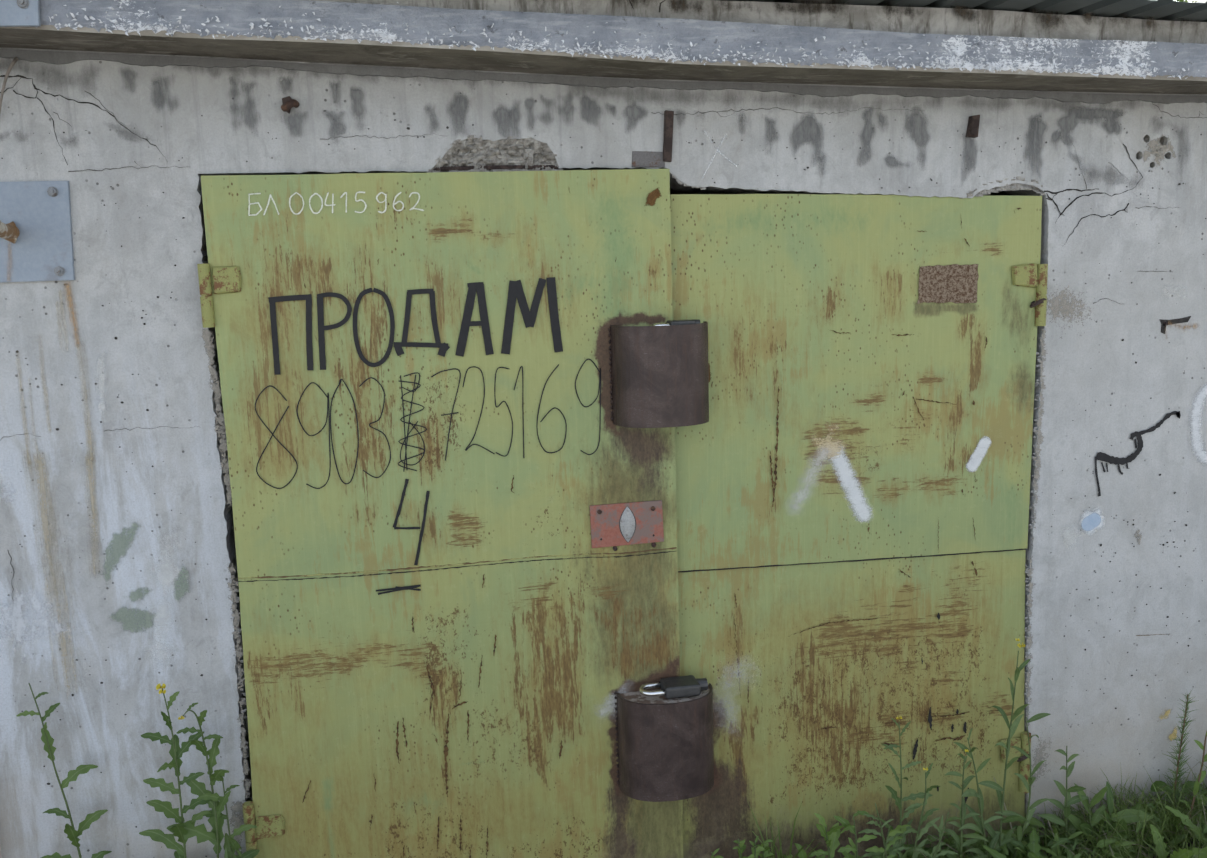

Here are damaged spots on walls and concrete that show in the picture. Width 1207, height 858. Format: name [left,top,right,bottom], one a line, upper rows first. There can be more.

crack [0,75,182,172]
water stain [327,74,363,136]
water stain [450,95,468,129]
spalling [427,124,563,173]
water stain [494,85,646,134]
water stain [792,115,823,170]
water stain [860,109,884,159]
water stain [906,109,928,157]
water stain [965,137,976,171]
water stain [1025,101,1123,168]
crack [1044,143,1179,244]
rust [917,264,979,304]